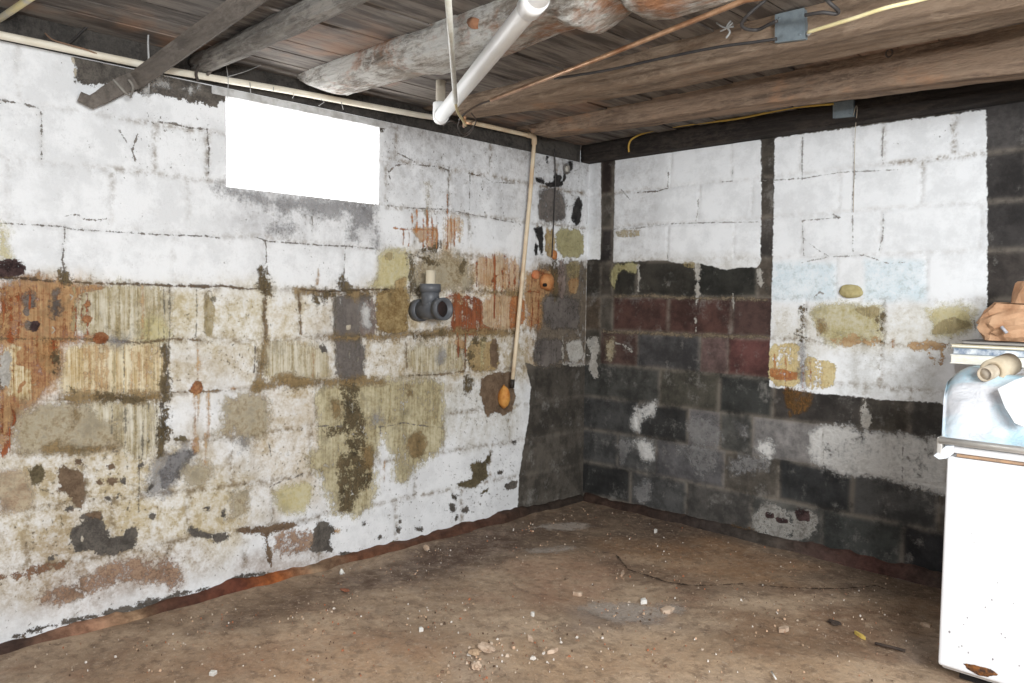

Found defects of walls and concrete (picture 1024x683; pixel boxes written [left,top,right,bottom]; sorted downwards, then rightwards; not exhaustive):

rust [393,191,464,252]
spalling [0,258,27,282]
rust [0,271,109,457]
water stain [213,187,500,519]
peeling [463,371,516,417]
rust [768,343,837,417]
spalling [0,458,211,639]
peeling [146,435,197,493]
peeling [188,506,351,578]
peeling [448,450,518,521]
crack [604,552,885,590]
spalling [751,501,819,541]